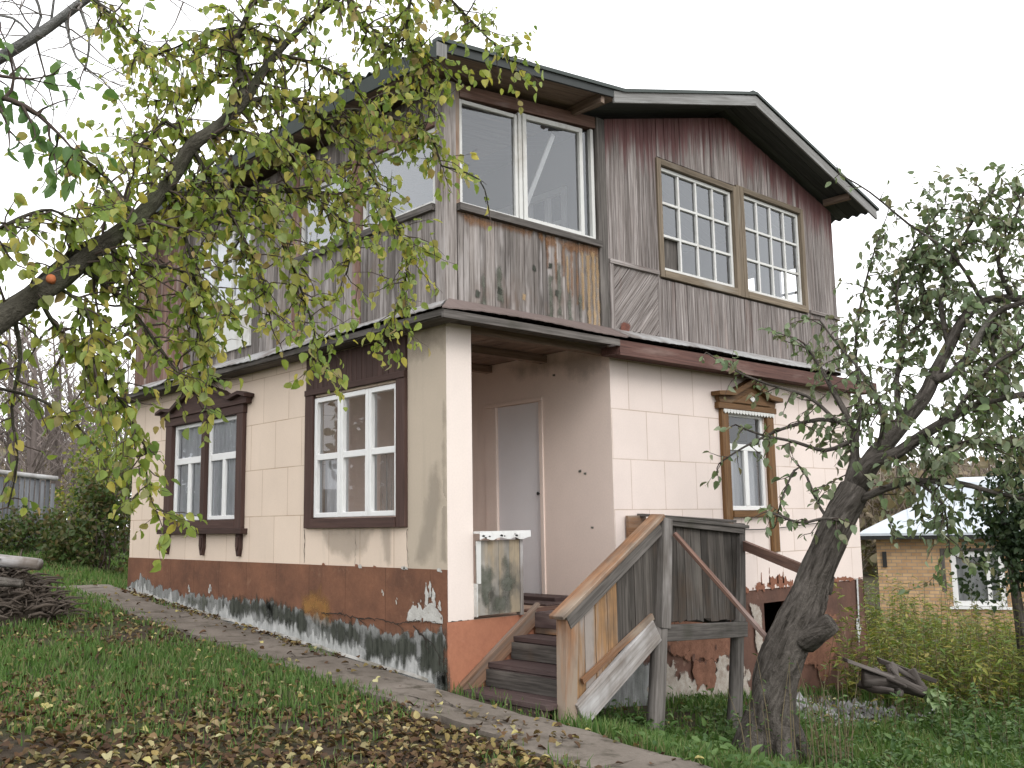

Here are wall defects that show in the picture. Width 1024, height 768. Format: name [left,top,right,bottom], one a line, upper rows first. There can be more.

peeling [127,573,446,690]
water stain [222,595,451,692]
peeling [666,638,730,702]
peeling [743,667,751,696]
peeling [750,603,763,653]
peeling [804,635,841,681]